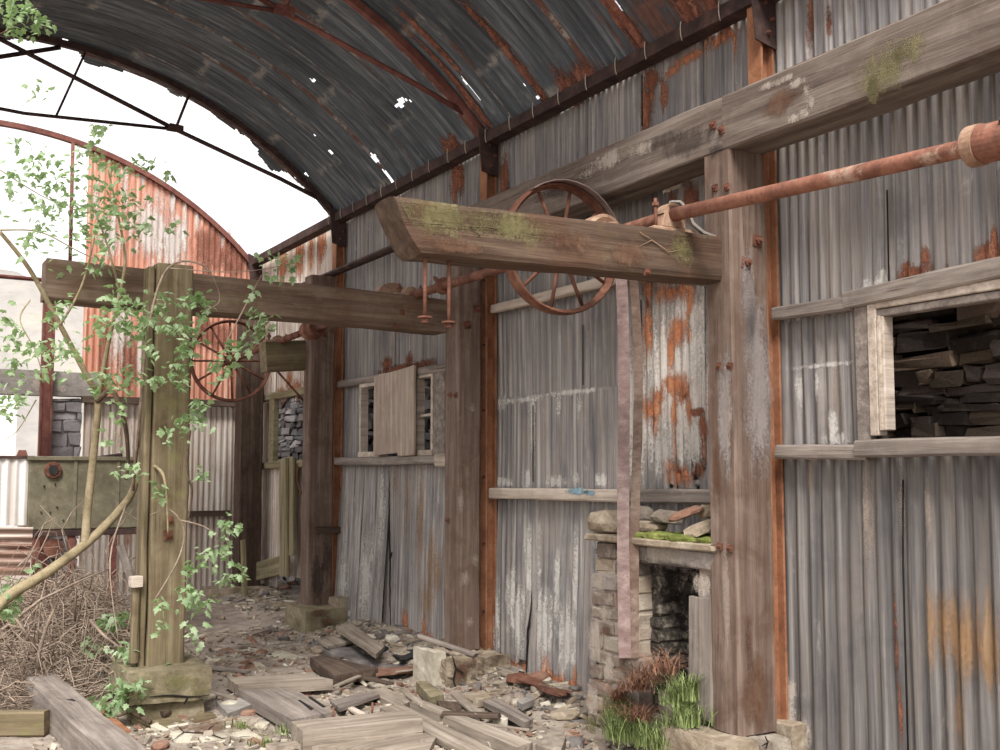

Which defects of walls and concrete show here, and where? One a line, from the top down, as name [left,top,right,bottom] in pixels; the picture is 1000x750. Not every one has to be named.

corrosion [395,7,494,131]
corrosion [456,0,546,102]
corrosion [600,0,646,48]
corrosion [643,26,742,130]
corrosion [449,163,465,205]
corrosion [669,182,699,205]
corrosion [195,223,246,278]
corrosion [896,247,932,279]
corrosion [974,227,1000,261]
corrosion [378,353,435,374]
corrosion [642,282,707,489]
damp [497,387,606,453]